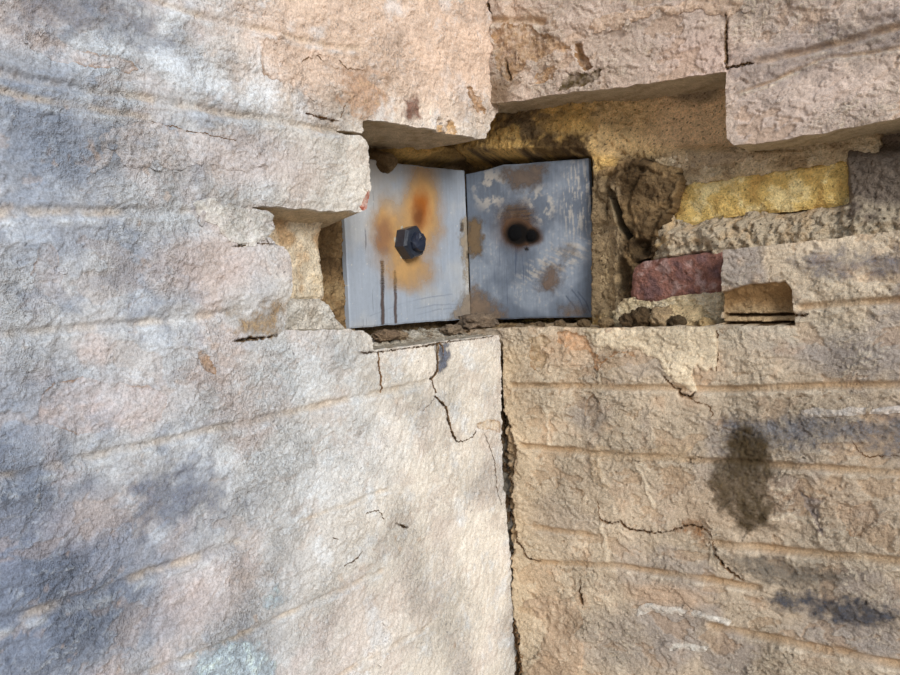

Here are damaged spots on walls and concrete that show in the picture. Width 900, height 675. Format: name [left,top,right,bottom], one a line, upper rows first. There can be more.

rust [374,168,439,325]
spalling [192,85,900,392]
crack [359,335,541,675]
crack [597,501,744,581]
crack [663,376,714,418]
leakage [709,417,900,532]